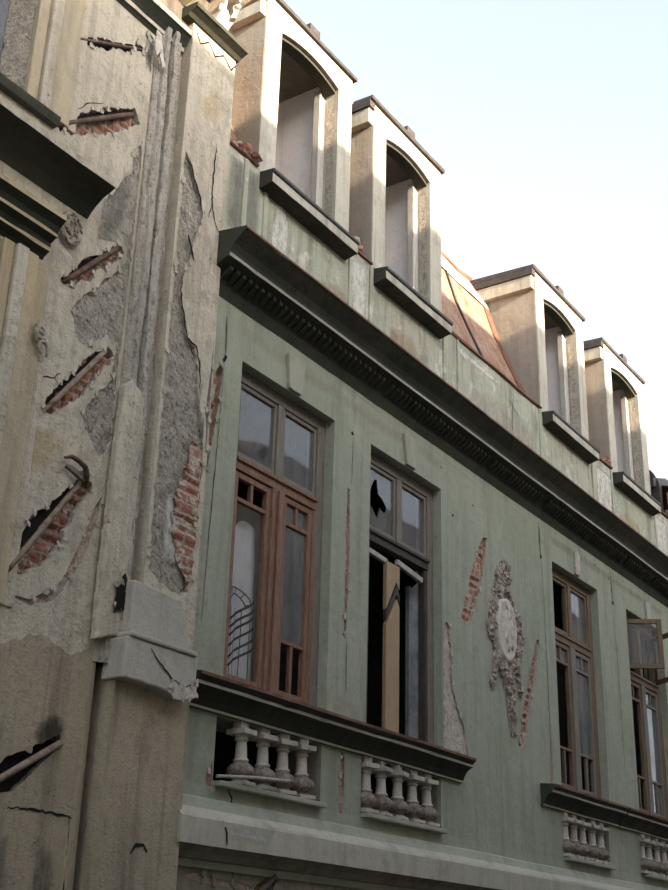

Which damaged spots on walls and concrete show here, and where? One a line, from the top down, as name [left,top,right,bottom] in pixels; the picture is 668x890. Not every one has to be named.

flaking render [87,29,165,72]
flaking render [58,106,136,138]
flaking render [41,146,141,455]
flaking render [146,155,224,615]
flaking render [14,471,104,606]
flaking render [461,539,484,623]
flaking render [443,623,467,755]
flaking render [492,634,541,747]